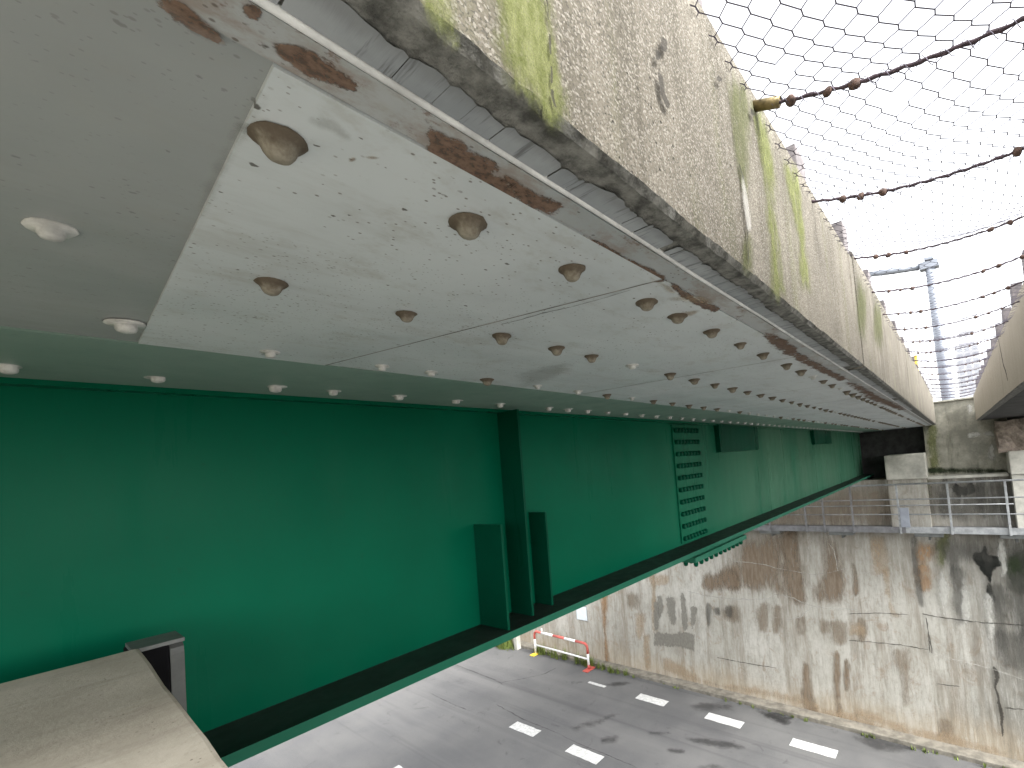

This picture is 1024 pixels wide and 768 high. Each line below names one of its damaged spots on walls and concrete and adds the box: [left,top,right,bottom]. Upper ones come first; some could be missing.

corrosion [157,0,224,44]
corrosion [243,5,262,21]
corrosion [274,44,357,92]
corrosion [427,129,563,214]
corrosion [764,334,904,410]
water stain [653,593,697,631]
water stain [758,605,781,632]
crack [700,594,1024,737]